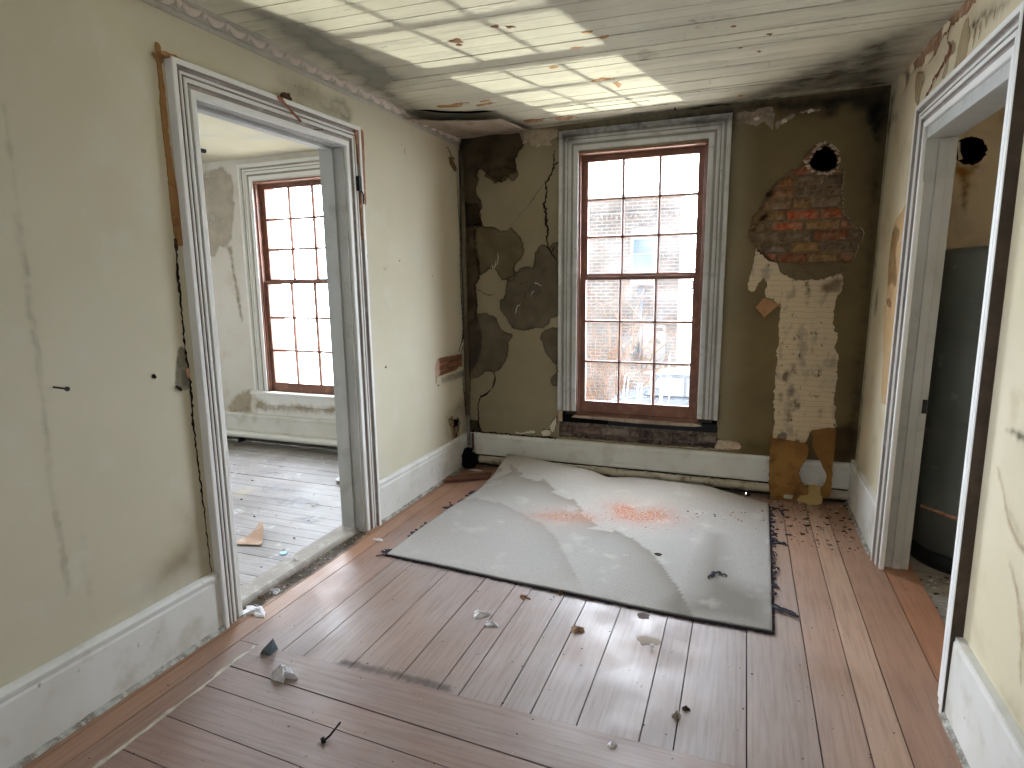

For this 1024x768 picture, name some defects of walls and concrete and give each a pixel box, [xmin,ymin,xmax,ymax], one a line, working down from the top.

leakage [668,103,732,124]
flaking render [735,106,821,130]
leakage [752,35,910,185]
leakage [204,168,235,278]
crack [510,151,559,262]
flaking render [747,141,863,280]
crack [457,183,556,439]
flaking render [435,354,462,386]